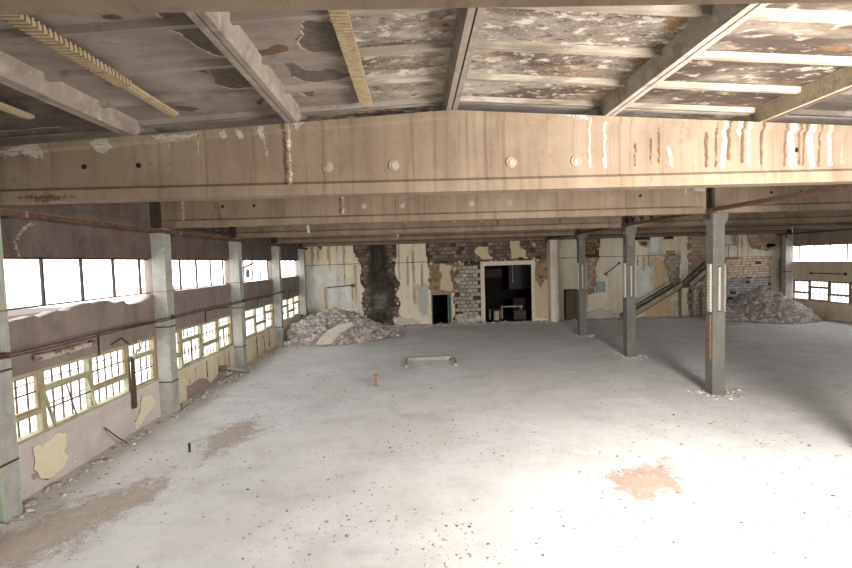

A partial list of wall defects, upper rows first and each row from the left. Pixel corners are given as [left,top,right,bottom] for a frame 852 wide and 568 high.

peeling [258,19,341,56]
peeling [286,63,350,98]
efflorescence [559,114,592,168]
efflorescence [650,120,684,167]
efflorescence [704,120,766,169]
efflorescence [783,123,843,168]
flaking render [747,233,781,251]
flaking render [353,244,419,325]
flaking render [426,236,548,323]
flaking render [585,239,600,294]
peeling [135,394,156,430]
peeling [32,432,78,480]